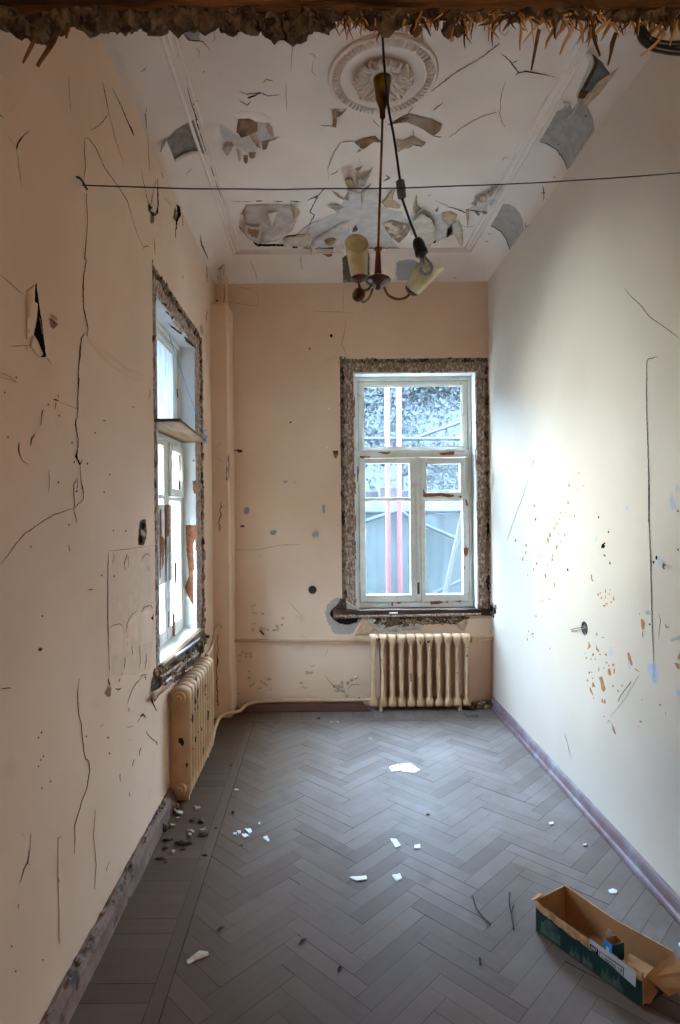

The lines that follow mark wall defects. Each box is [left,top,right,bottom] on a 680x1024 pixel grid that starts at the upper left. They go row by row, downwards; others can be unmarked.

flaking render [0,4,680,49]
peeling [160,110,280,164]
peeling [322,108,347,127]
peeling [343,136,381,152]
peeling [388,107,442,151]
crack [430,31,553,137]
peeling [539,52,619,169]
peeling [240,166,524,283]
crack [0,86,164,565]
flaking render [324,356,497,636]
spalling [585,633,623,734]
crack [58,678,110,943]